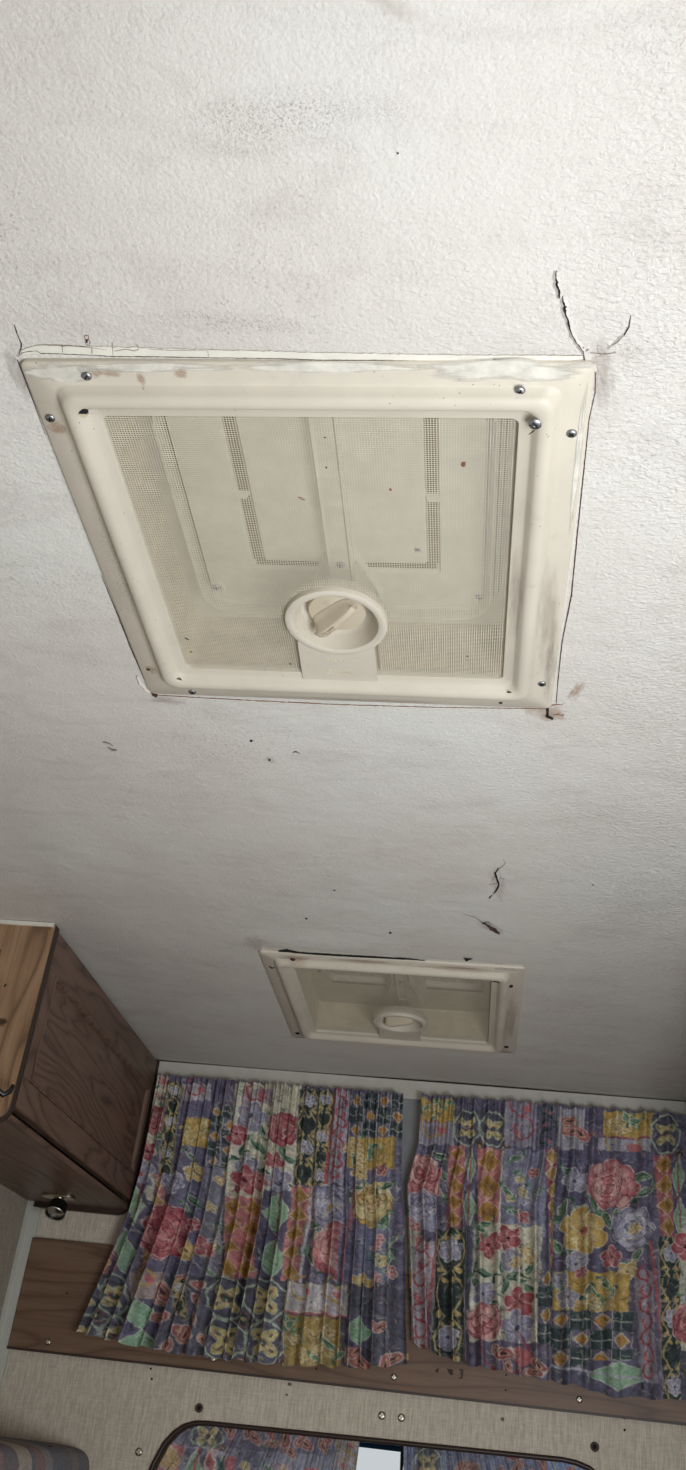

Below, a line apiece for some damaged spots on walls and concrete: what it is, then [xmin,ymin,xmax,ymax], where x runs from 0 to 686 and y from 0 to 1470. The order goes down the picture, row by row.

crack [552,270,631,372]
crack [489,861,506,899]